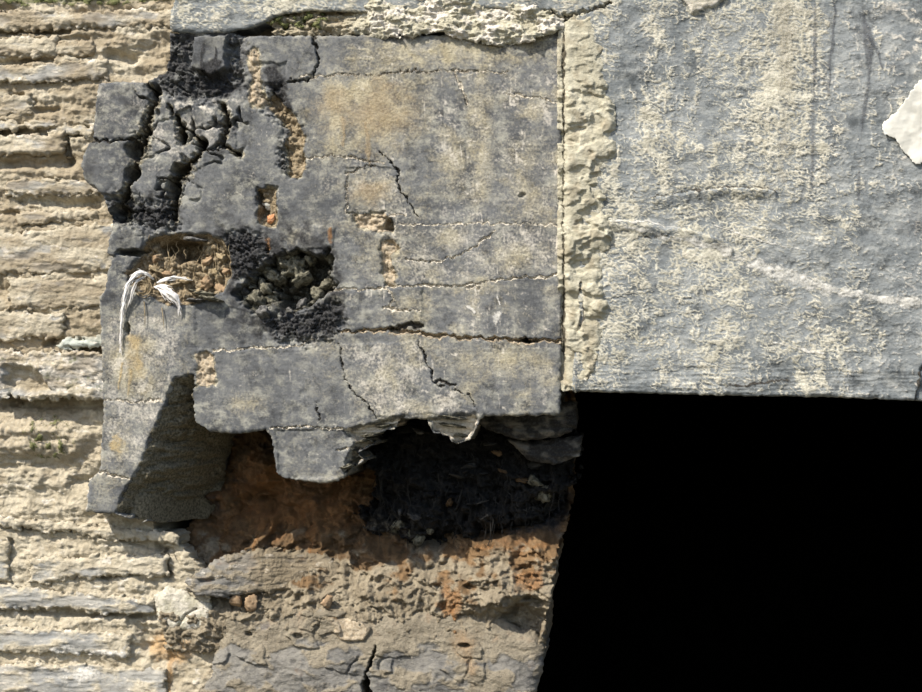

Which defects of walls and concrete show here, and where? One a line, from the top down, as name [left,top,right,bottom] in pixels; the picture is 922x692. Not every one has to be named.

crack [93,84,242,223]
peeling [882,80,922,164]
crack [290,3,612,414]
spalling [125,233,232,306]
spalling [236,249,338,319]
crack [212,339,313,353]
spalling [339,419,400,470]
spalling [431,414,477,443]
crack [363,649,376,692]